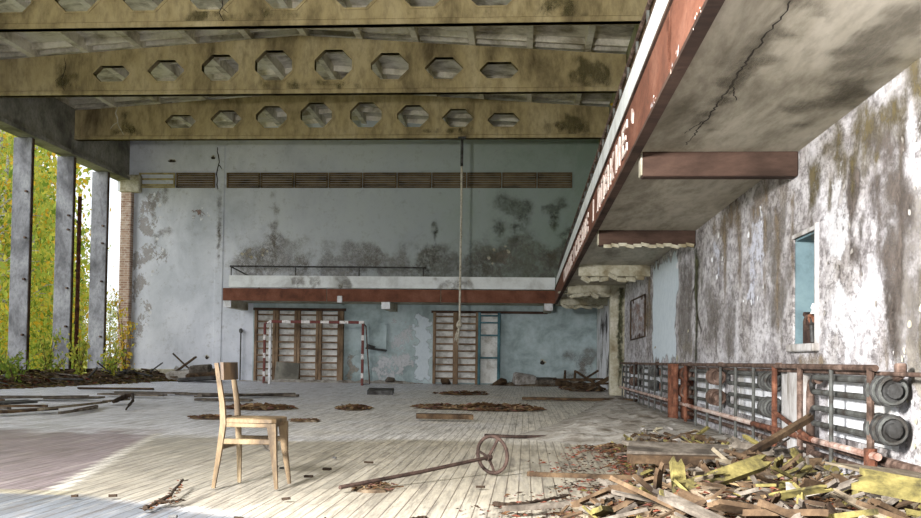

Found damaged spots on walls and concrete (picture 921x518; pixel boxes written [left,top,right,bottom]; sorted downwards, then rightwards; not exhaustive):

leakage [569,57,610,86]
flaking render [130,191,168,352]
peeling [343,313,433,383]
leakage [417,197,563,283]
leakage [678,179,794,355]
leakage [847,133,921,364]